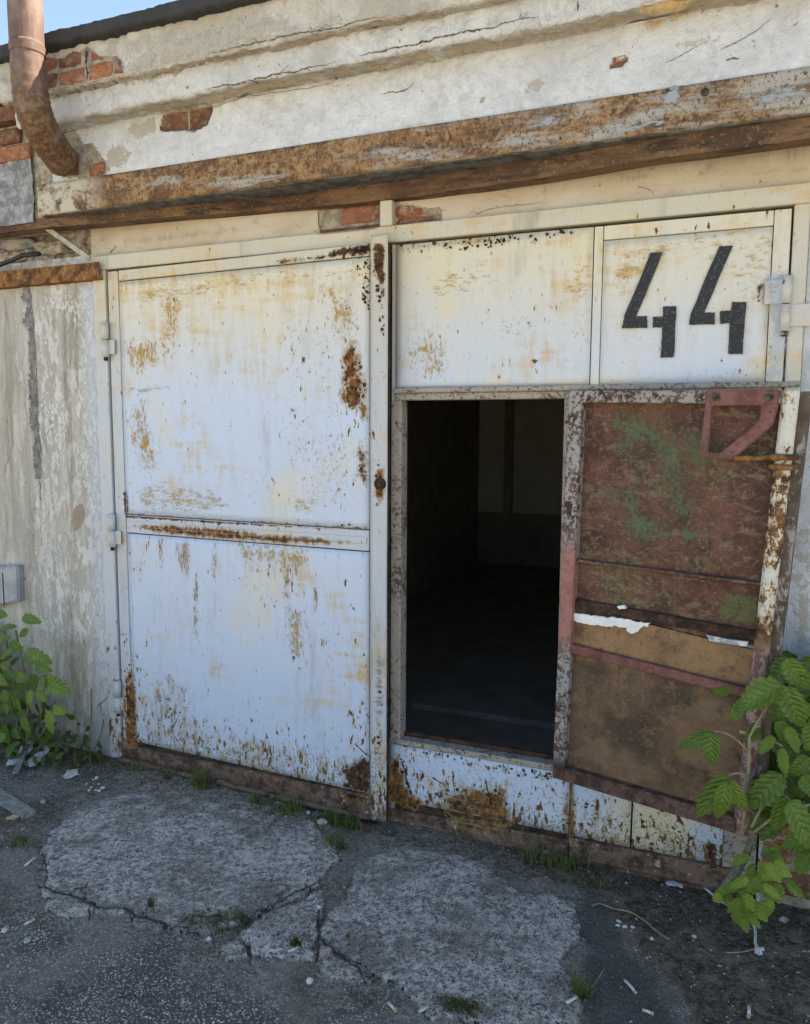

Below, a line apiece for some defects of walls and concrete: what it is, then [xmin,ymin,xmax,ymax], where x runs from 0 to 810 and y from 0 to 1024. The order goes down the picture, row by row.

spalling [45,47,124,97]
crack [207,13,535,110]
spalling [128,104,213,139]
spalling [316,204,380,235]
spalling [395,202,442,225]
spalling [21,287,87,502]
corrosion [323,288,367,419]
corrosion [357,450,383,506]
corrosion [123,401,367,656]
corrosion [123,660,422,811]
crack [35,853,207,933]
crack [245,882,368,978]